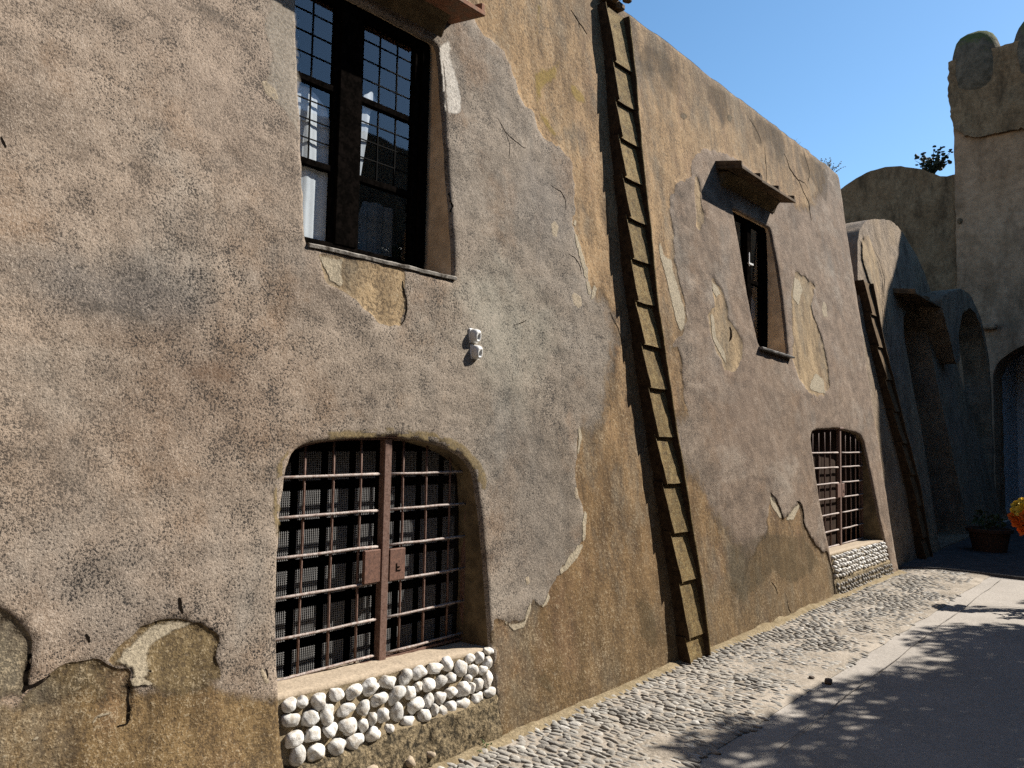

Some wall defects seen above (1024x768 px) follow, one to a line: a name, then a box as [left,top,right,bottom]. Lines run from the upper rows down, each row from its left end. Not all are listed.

peeling [440,41,461,114]
crack [749,118,812,220]
flaking render [319,254,406,326]
peeling [468,0,835,736]
peeling [0,608,283,768]